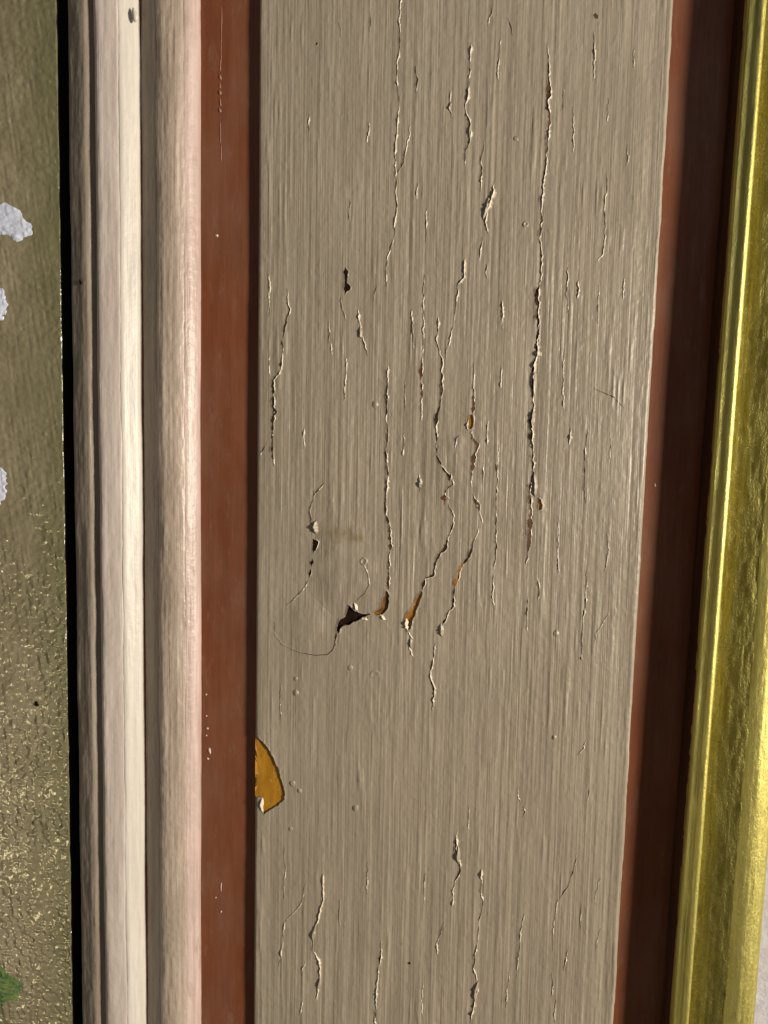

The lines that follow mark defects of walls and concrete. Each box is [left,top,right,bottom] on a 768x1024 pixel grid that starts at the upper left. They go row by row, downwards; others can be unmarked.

crack [259,274,291,467]
crack [327,0,513,711]
crack [524,32,630,632]
peeling [354,588,392,620]
peeling [401,589,425,634]
crack [579,534,610,661]
peeling [255,735,287,816]
crack [277,848,341,1015]
crack [435,805,484,1022]